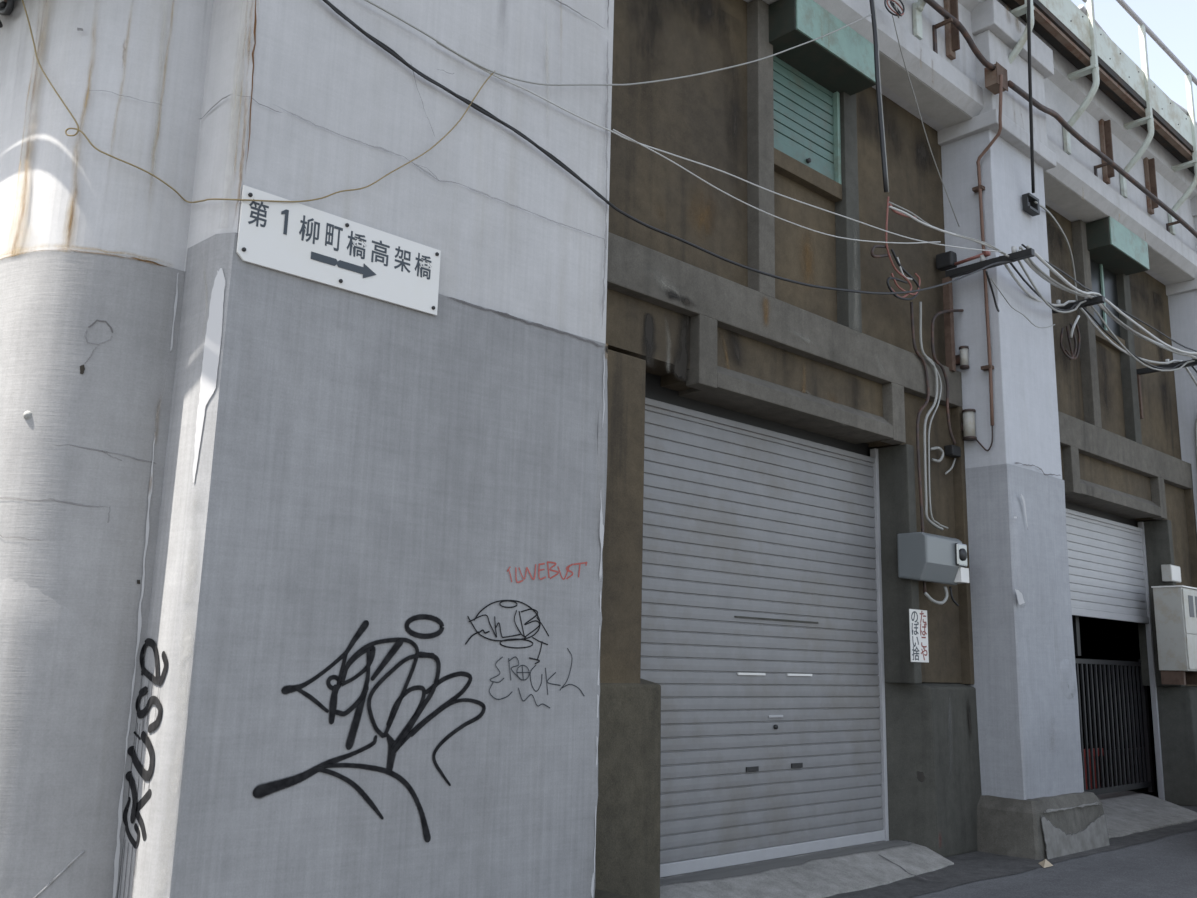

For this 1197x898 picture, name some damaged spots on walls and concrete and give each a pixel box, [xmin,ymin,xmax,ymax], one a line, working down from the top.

crack [200,94,279,119]
rust [235,0,257,203]
rust [79,248,166,267]
peeling [193,268,226,483]